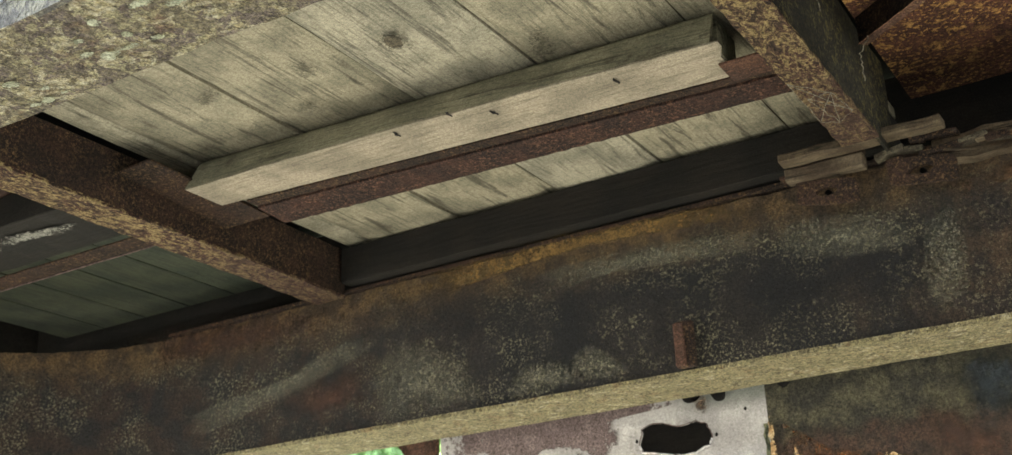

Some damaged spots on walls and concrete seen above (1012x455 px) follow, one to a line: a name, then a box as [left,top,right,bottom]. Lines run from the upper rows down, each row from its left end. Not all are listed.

rust [437,208,729,287]
peeling [763,420,777,455]
rust [764,343,1012,455]